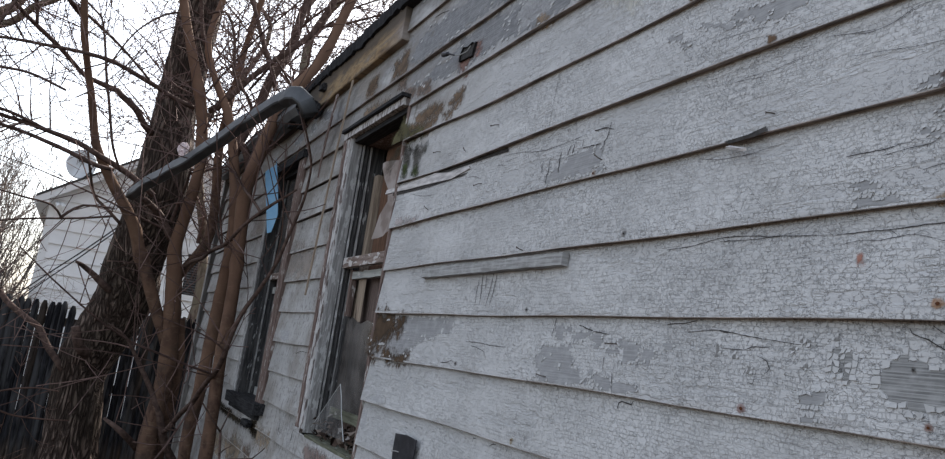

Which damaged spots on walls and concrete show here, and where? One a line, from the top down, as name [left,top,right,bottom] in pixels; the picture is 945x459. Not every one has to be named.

peeling [406,0,579,90]
water stain [364,75,388,116]
water stain [386,48,466,179]
crack [668,231,814,250]
crack [837,222,945,245]
peeling [368,314,456,358]
peeling [533,323,676,395]
crack [667,321,823,384]
peeling [825,333,858,385]
peeling [870,347,945,419]
crack [909,326,945,354]
water stain [303,446,326,459]